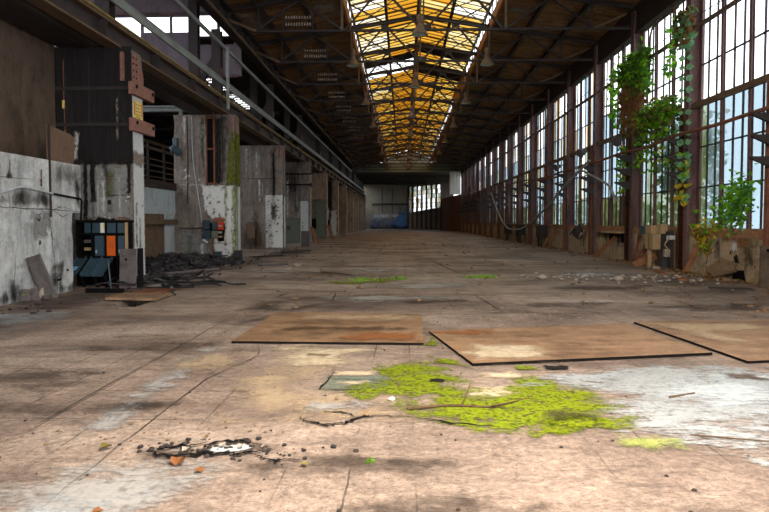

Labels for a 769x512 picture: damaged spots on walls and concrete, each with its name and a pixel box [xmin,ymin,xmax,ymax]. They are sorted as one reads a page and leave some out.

leakage [76,151,144,219]
peeling [185,175,239,257]
leakage [216,119,238,250]
spalling [149,439,267,458]
crack [299,411,490,427]
leakage [525,364,769,448]